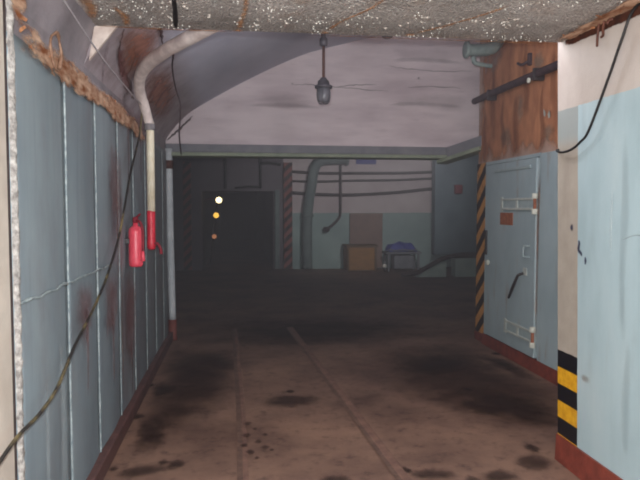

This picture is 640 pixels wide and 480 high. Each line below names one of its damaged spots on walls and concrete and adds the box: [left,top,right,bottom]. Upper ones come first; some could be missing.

rust [11,0,145,140]
rust [115,8,182,69]
rust [480,0,640,162]